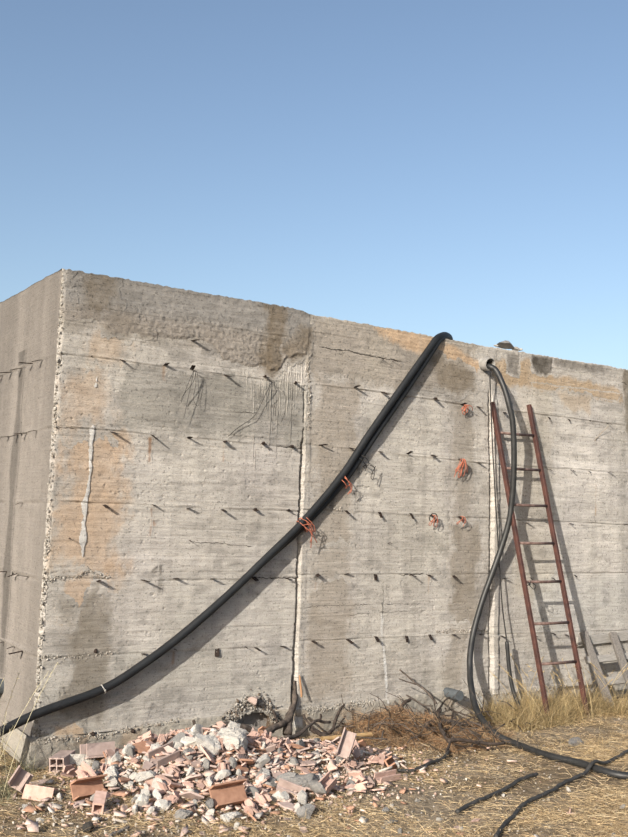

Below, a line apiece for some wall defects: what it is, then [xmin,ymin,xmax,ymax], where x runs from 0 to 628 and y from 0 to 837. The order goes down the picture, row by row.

leakage [0,350,26,679]
leakage [44,270,157,745]
leakage [239,302,368,514]
leakage [291,458,367,729]